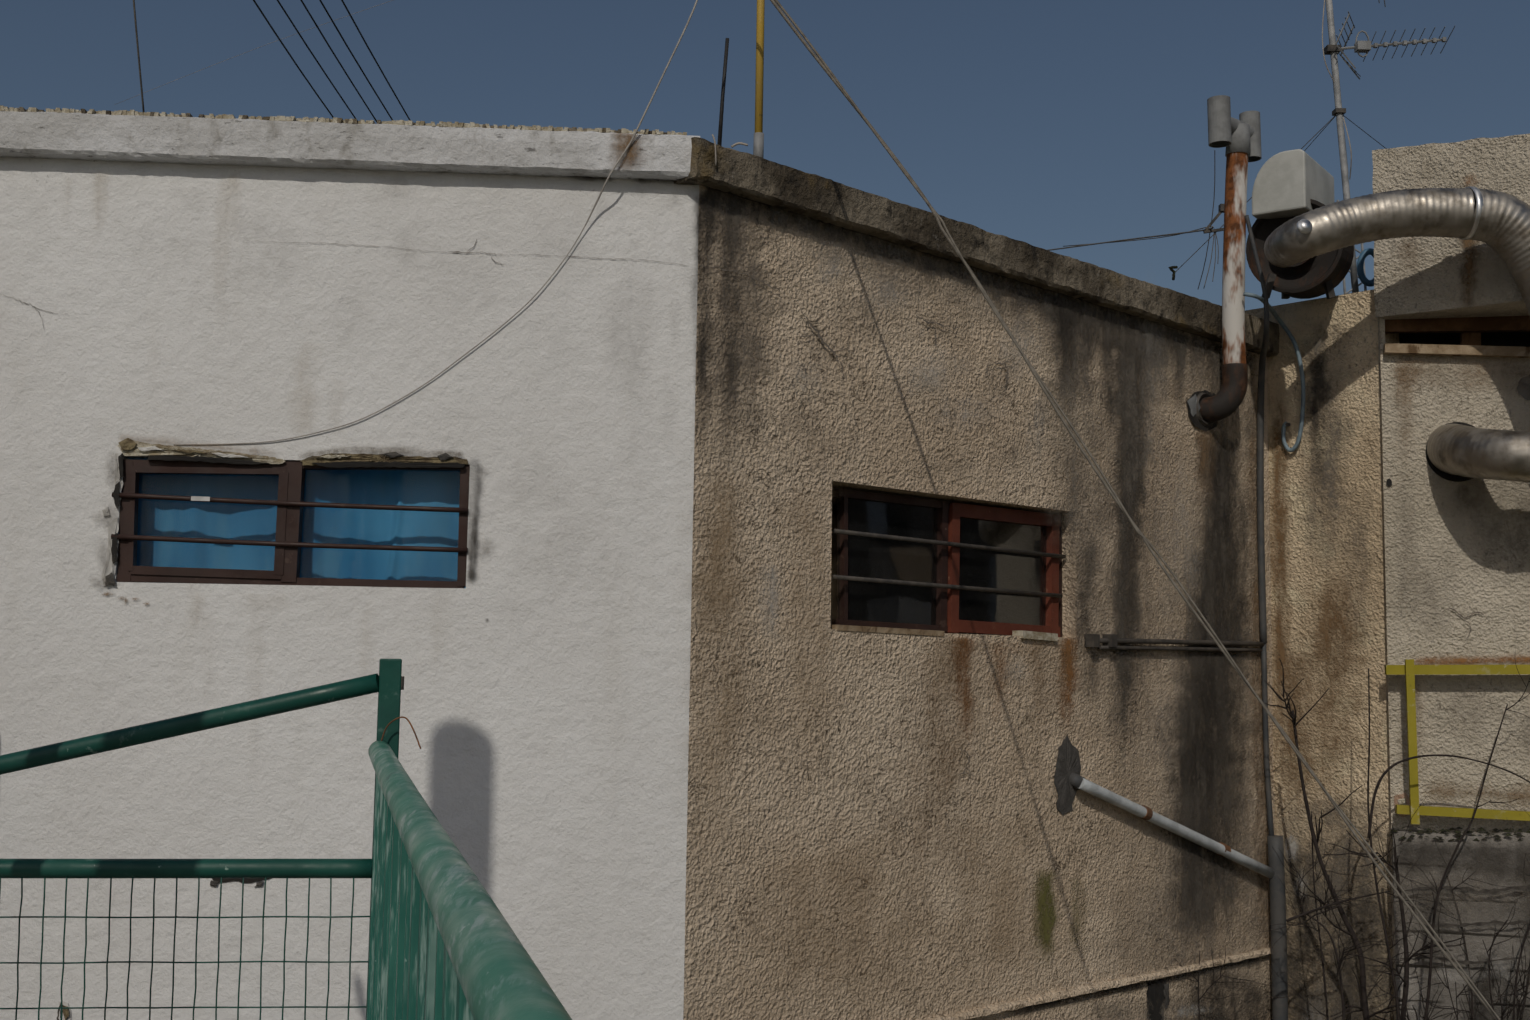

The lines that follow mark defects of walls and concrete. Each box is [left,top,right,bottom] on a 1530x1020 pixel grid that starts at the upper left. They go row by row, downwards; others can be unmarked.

damp [696,187,1223,716]
corrosion [1062,638,1074,703]
damp [1174,419,1250,922]
damp [1315,589,1353,709]
damp [1036,874,1056,947]